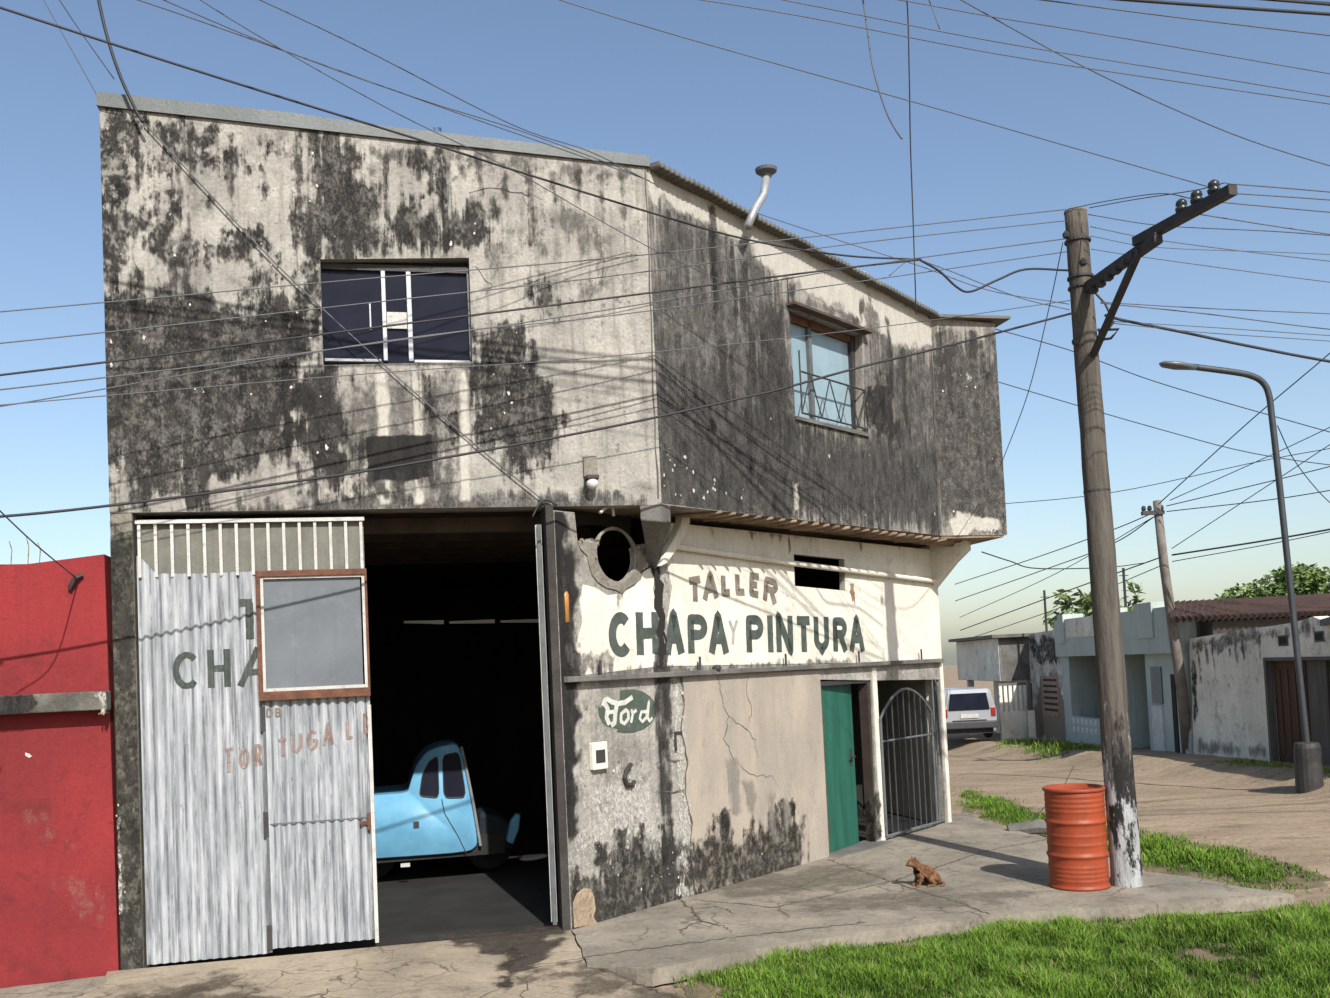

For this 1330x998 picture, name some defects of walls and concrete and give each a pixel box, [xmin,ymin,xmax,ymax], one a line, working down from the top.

water stain [100,108,629,512]
water stain [700,205,756,468]
water stain [864,316,912,459]
water stain [1192,621,1314,680]
peeling [575,758,662,863]
peeling [672,687,693,897]
water stain [561,559,809,930]
water stain [1198,740,1265,756]
crack [481,953,675,998]